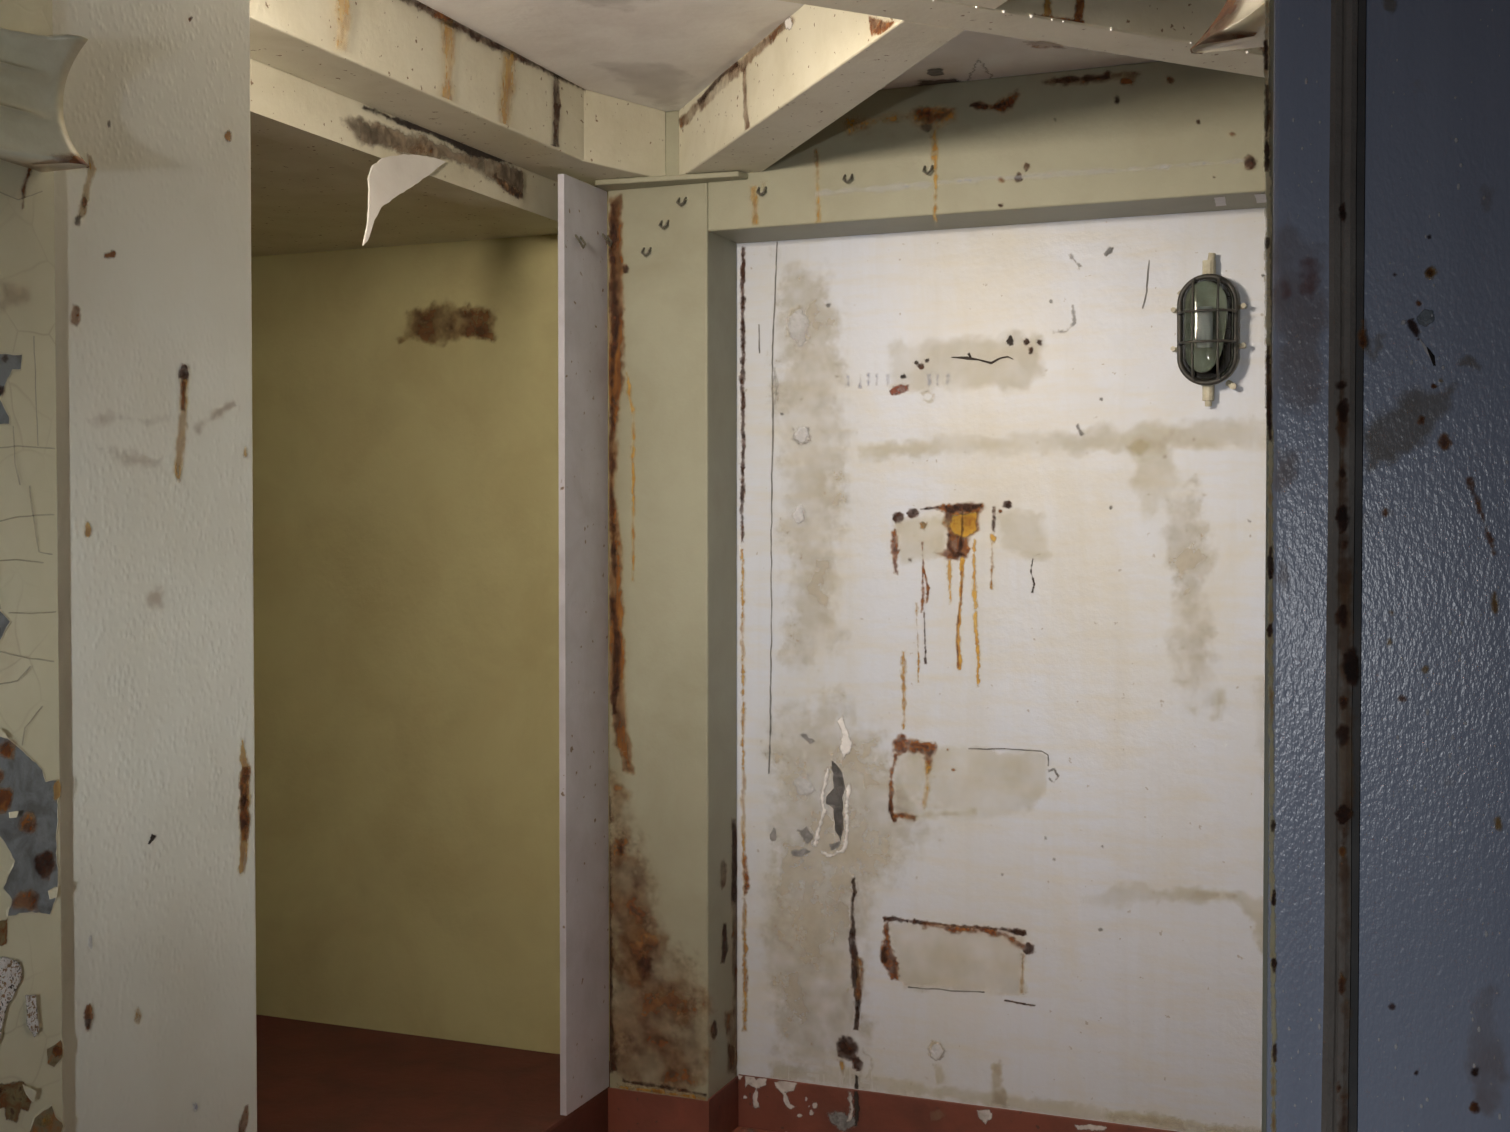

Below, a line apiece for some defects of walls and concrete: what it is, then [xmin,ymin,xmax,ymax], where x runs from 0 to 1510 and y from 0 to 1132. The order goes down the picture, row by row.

peeling [0,352,23,426]
corrosion [1335,381,1358,745]
corrosion [608,195,750,1100]
corrosion [888,501,1011,822]
peeling [0,729,64,1068]
spalling [792,715,852,857]
corrosion [880,916,1034,993]
corrosion [968,748,1059,781]
corrosion [1335,799,1352,882]
peeling [0,1081,65,1132]